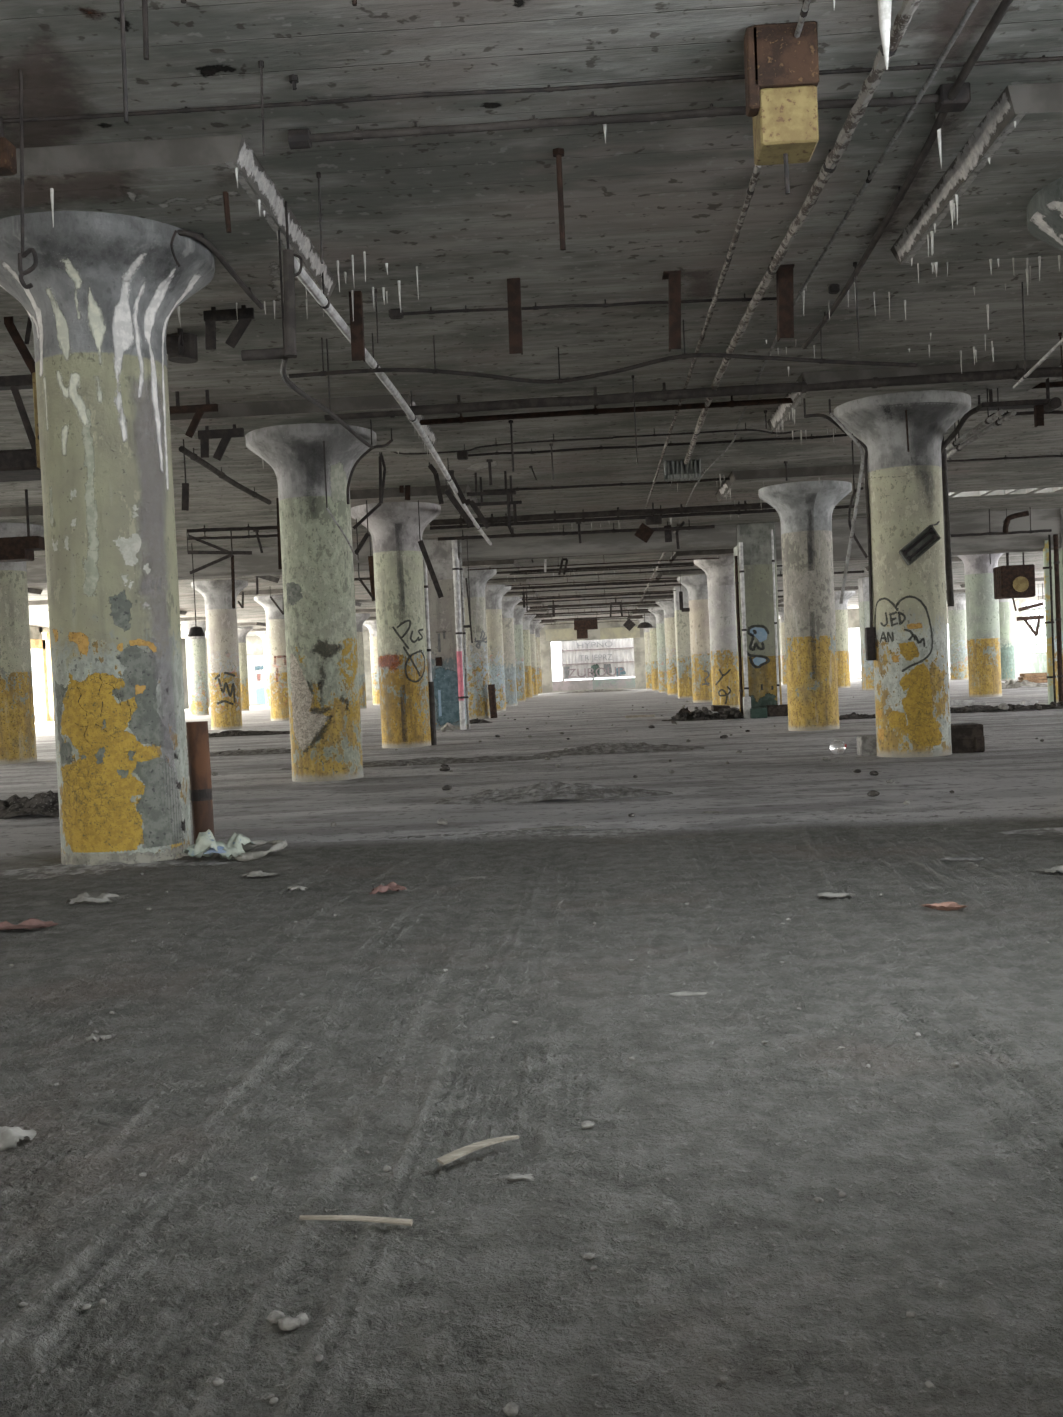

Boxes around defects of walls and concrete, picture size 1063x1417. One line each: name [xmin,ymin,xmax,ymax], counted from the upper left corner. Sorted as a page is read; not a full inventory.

damp [158,142,333,319]
damp [894,92,1027,283]
damp [1030,201,1063,271]
damp [0,251,201,840]
spalling [286,582,303,606]
peeling [52,504,187,865]
spalling [290,638,360,752]
peeling [877,623,943,746]